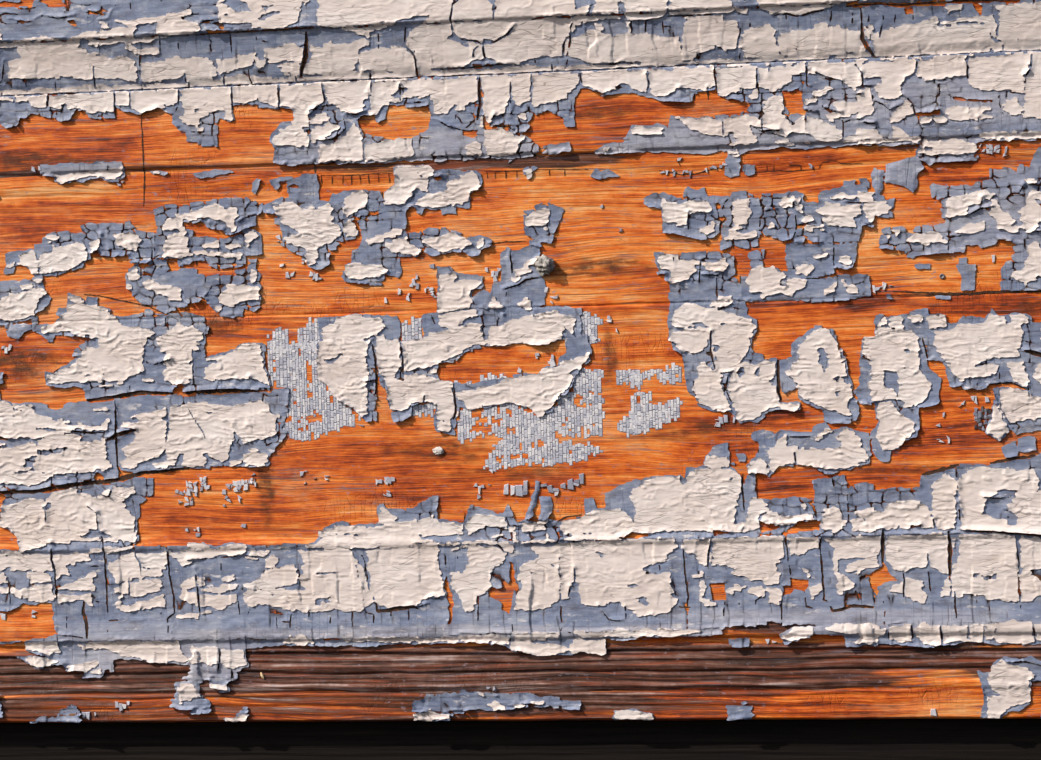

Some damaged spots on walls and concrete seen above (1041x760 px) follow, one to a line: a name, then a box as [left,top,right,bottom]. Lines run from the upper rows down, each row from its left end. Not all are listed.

crack [219,32,309,87]
crack [330,0,720,131]
peeling [454,0,1041,74]
peeling [755,360,1041,538]
crack [82,537,118,638]
peeling [0,549,723,693]
crack [375,603,419,621]
peeling [199,537,1041,721]
crack [819,537,874,612]
peeling [781,520,1041,627]
crack [947,530,1041,576]
peeling [0,643,453,723]